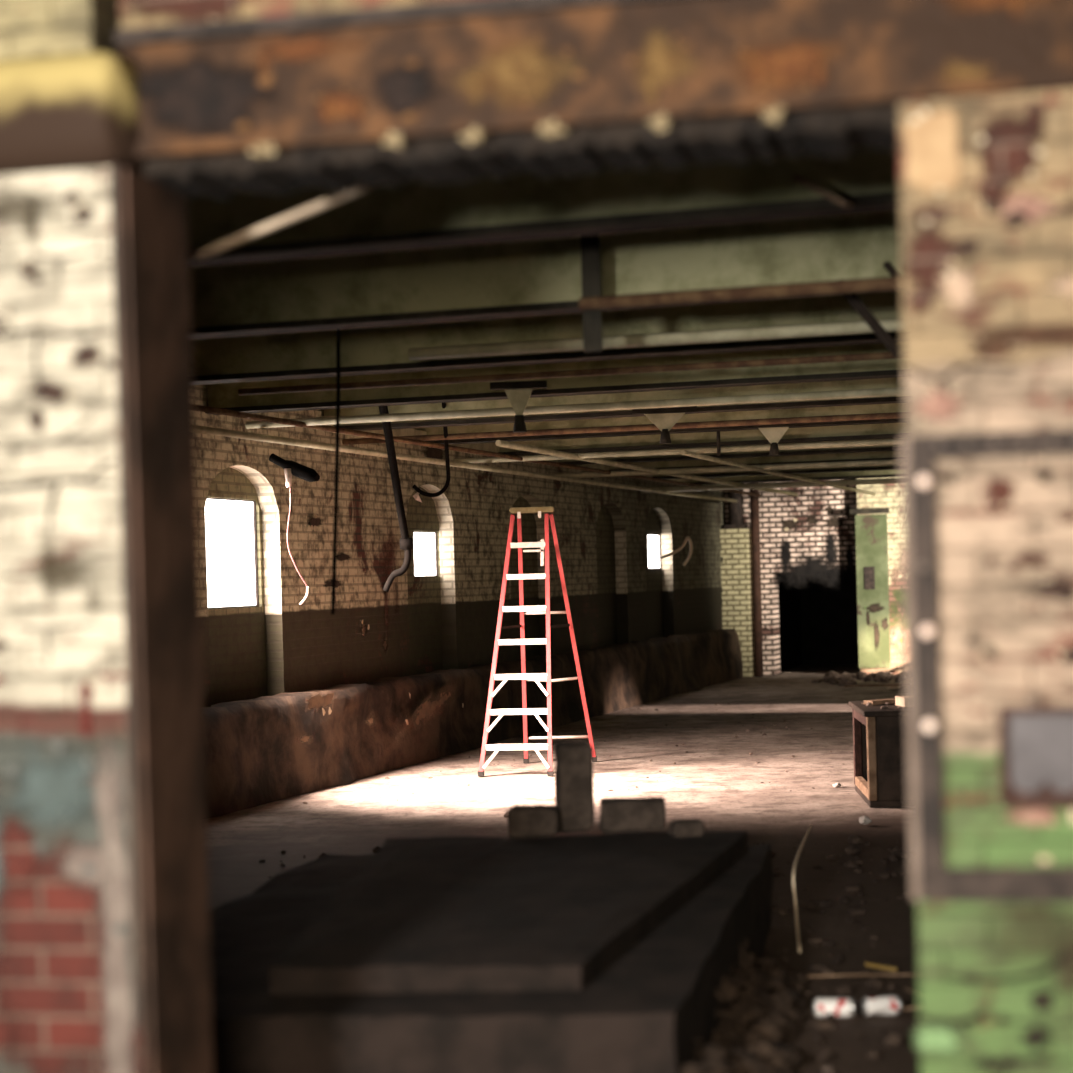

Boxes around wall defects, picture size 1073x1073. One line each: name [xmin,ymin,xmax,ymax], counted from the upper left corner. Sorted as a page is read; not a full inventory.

peeling [904,108,979,312]
spalling [976,102,1073,228]
spalling [972,323,1073,358]
peeling [890,627,905,650]